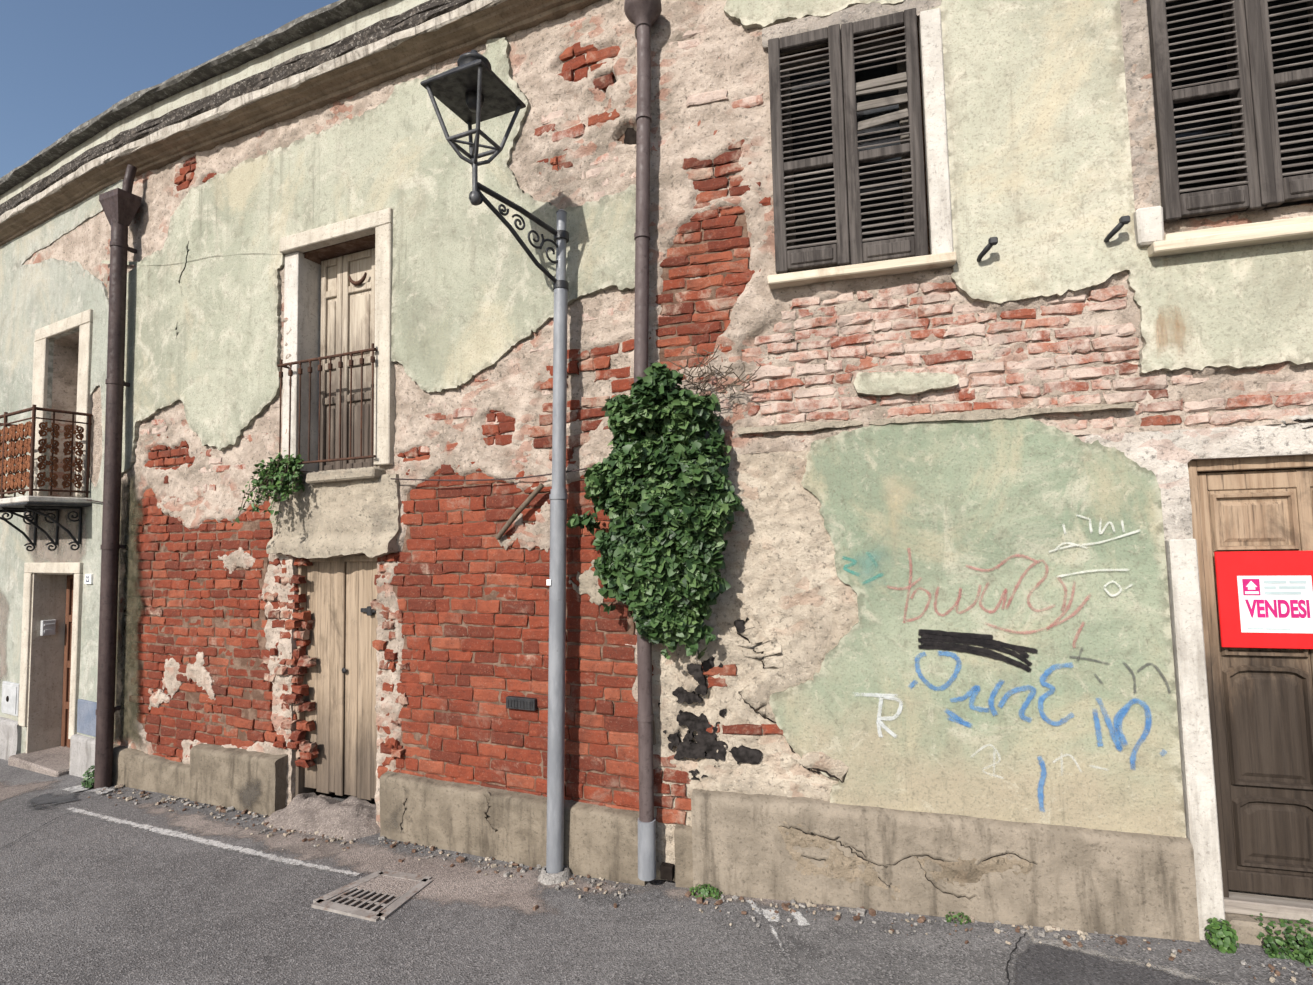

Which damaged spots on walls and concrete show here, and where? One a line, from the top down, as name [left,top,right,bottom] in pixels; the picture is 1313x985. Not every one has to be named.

flaking render [127,44,486,273]
flaking render [23,211,111,298]
crack [102,241,282,339]
flaking render [90,386,102,487]
flaking render [370,0,1313,882]
flaking render [113,266,319,807]
crack [482,791,498,832]
crack [777,822,1038,900]
spalling [914,852,1033,889]